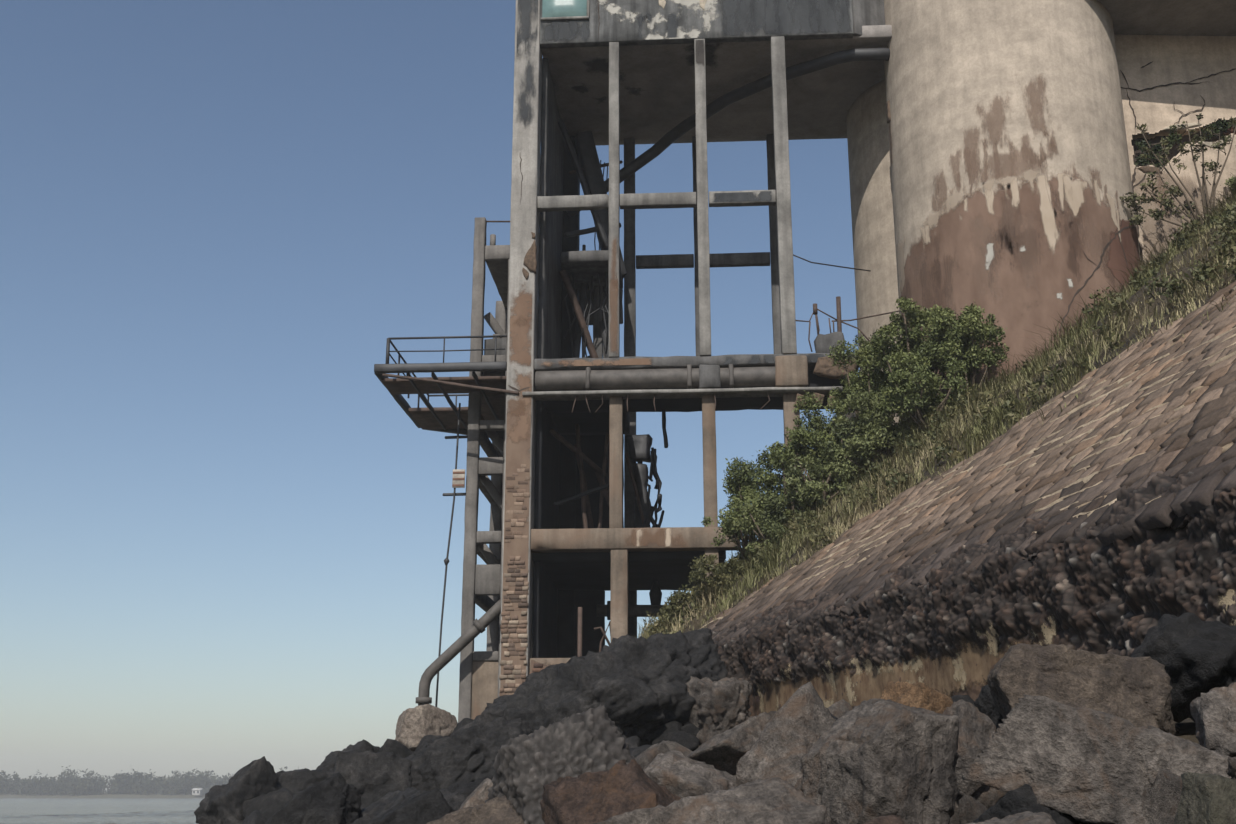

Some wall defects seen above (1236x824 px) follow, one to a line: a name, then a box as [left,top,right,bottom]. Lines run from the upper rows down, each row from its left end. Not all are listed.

peeling [599,0,717,40]
damp [638,14,678,38]
damp [516,0,590,124]
crack [1120,62,1235,130]
spalling [1131,122,1236,174]
spalling [522,232,537,279]
crack [1055,166,1147,337]